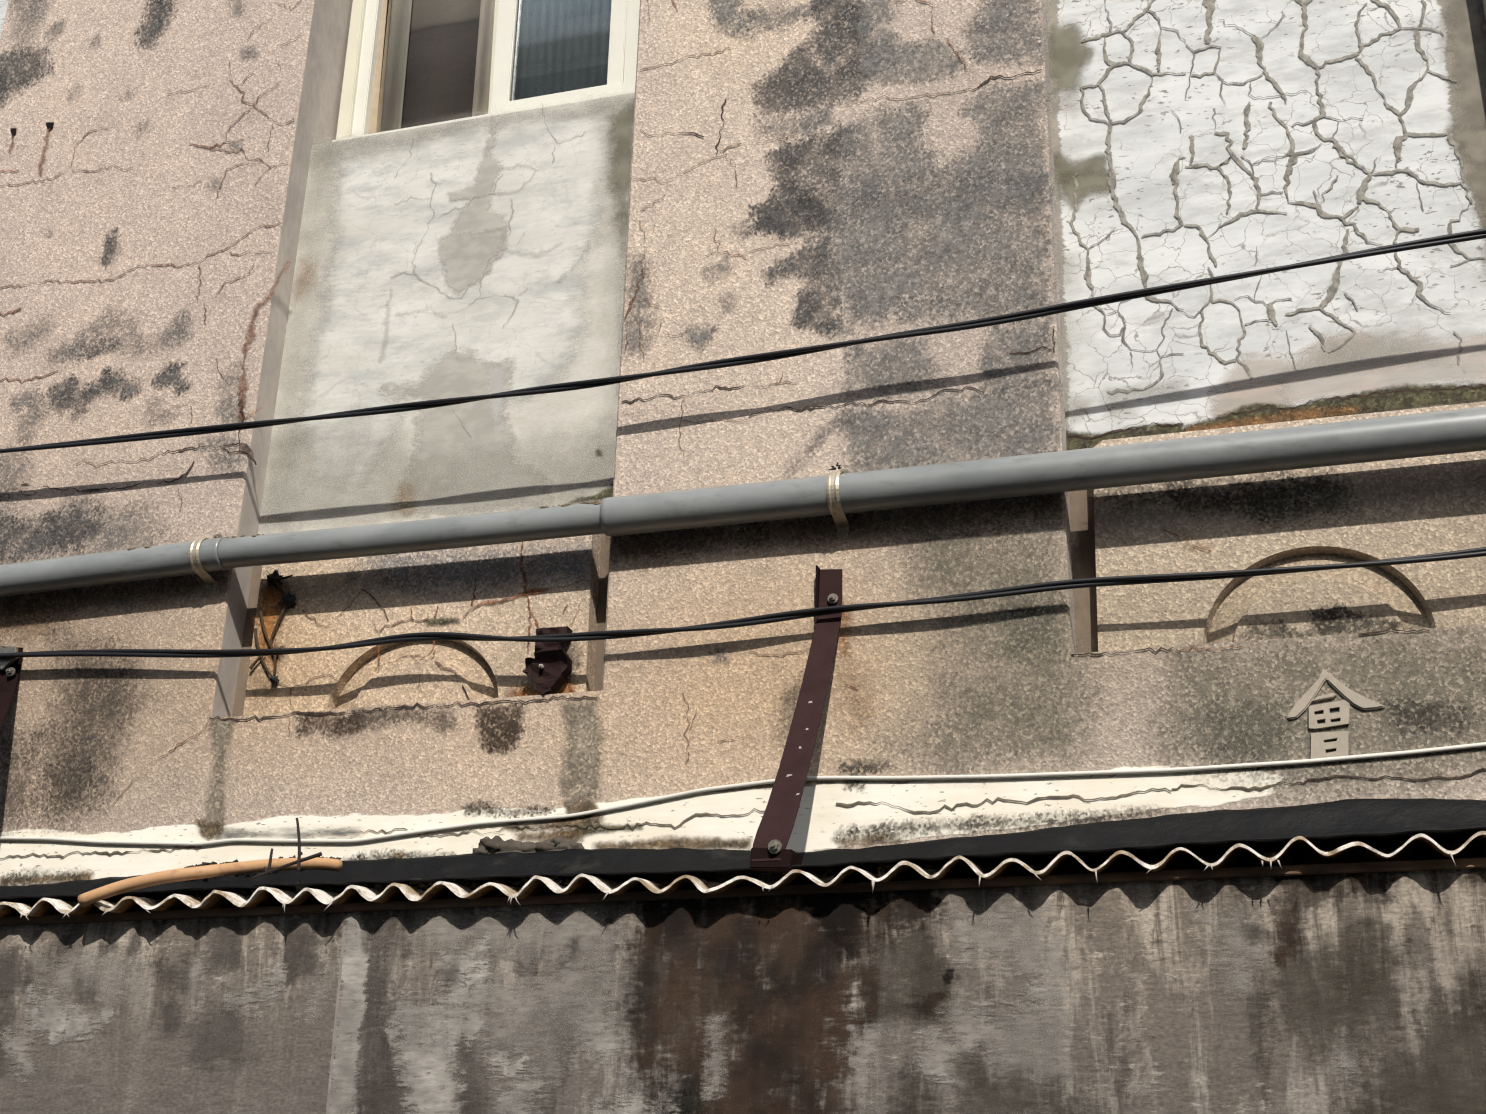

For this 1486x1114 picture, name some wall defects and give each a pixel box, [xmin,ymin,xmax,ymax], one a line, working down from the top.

crack [167,0,302,199]
crack [847,0,1042,105]
water stain [710,0,1486,472]
crack [1069,0,1485,394]
mould [5,312,190,438]
crack [0,222,282,509]
crack [1009,328,1055,354]
crack [210,542,597,735]
water stain [475,703,524,754]
water stain [463,801,750,849]
water stain [837,807,1151,845]
water stain [617,862,960,1114]